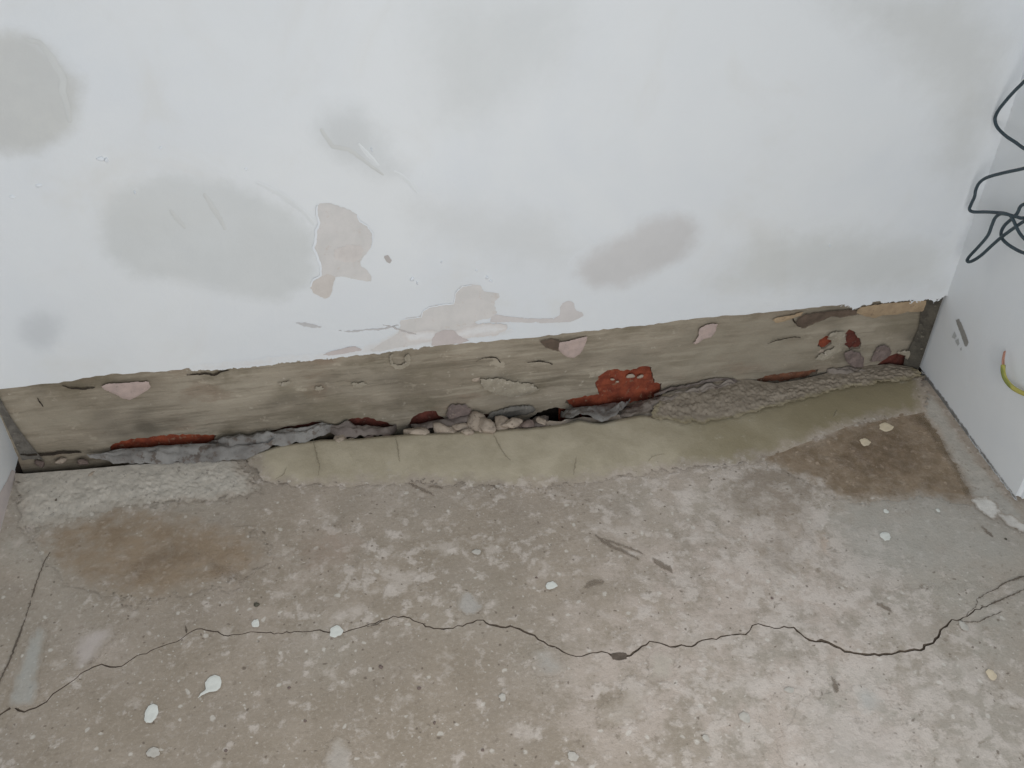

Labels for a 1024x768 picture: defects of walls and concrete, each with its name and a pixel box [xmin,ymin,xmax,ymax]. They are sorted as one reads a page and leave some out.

water stain [0,23,92,163]
water stain [87,167,320,308]
peeling [310,203,374,299]
water stain [304,93,708,296]
peeling [190,284,583,371]
flaking render [111,434,215,450]
flaking render [271,422,322,432]
flaking render [349,417,394,427]
flaking render [409,411,445,429]
flaking render [534,366,660,421]
crack [0,552,50,681]
crack [0,576,1024,715]